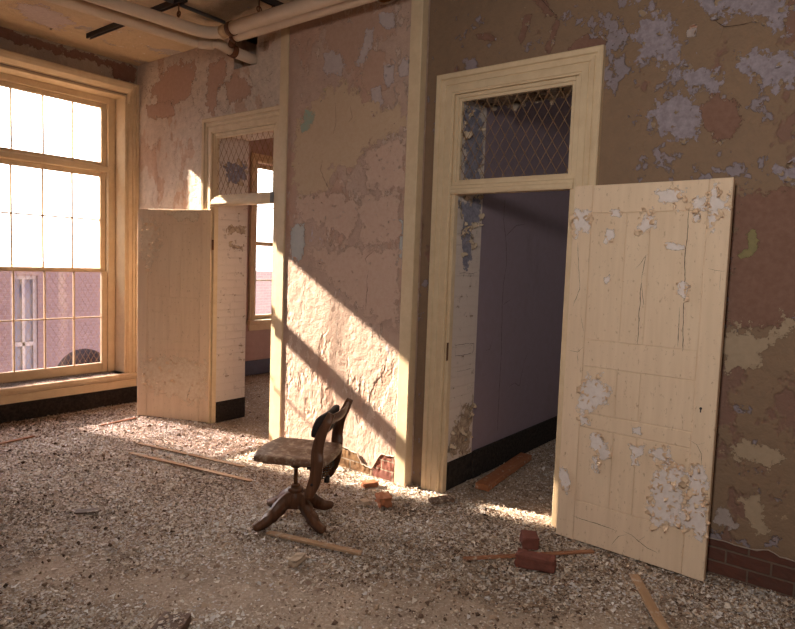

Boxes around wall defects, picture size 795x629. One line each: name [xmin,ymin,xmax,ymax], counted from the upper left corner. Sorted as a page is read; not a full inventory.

peeling [0,27,137,83]
peeling [146,58,197,120]
peeling [205,57,253,117]
peeling [568,33,607,51]
peeling [628,0,795,144]
peeling [287,223,306,263]
peeling [458,194,485,271]
peeling [447,394,477,458]
peeling [575,372,613,474]
flaking render [339,446,395,483]
flaking render [628,427,795,599]